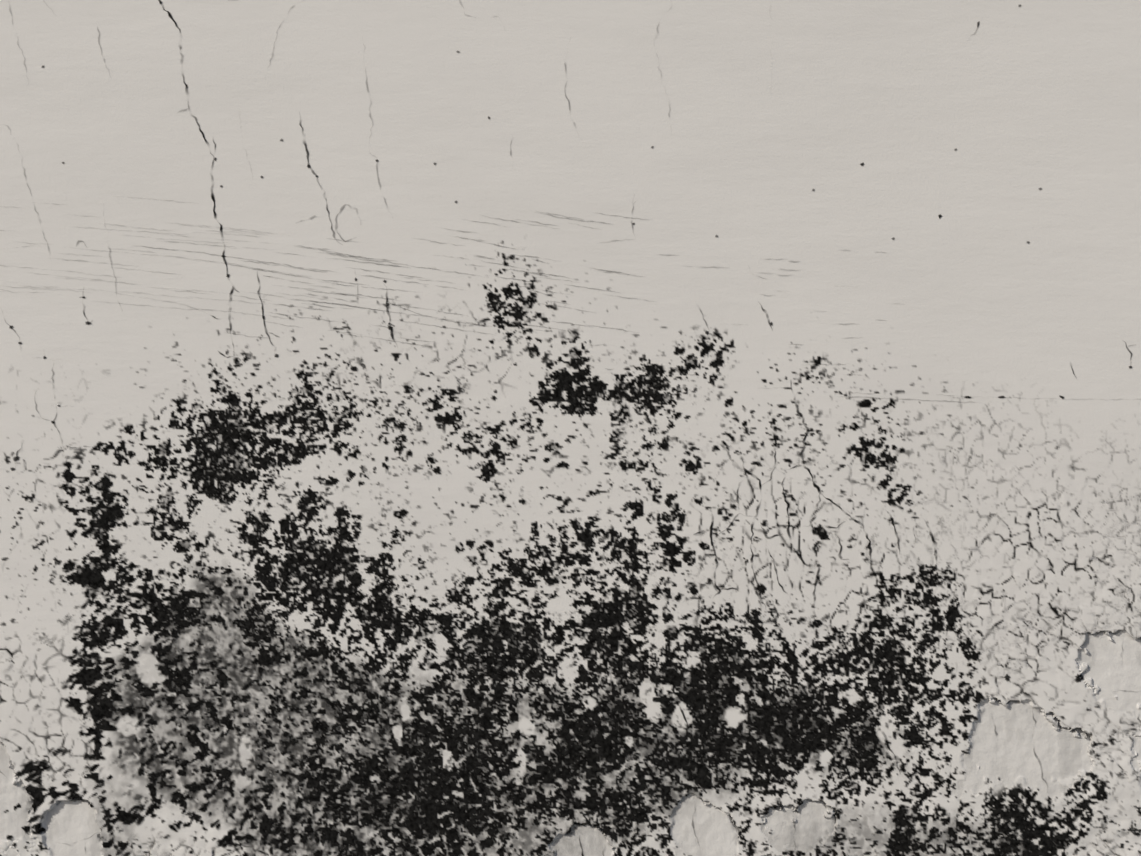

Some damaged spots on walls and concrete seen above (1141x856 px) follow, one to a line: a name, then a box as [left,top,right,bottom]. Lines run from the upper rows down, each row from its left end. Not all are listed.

crack [211,193,278,357]
mould [4,241,1141,856]
crack [695,404,900,626]
crack [931,503,1138,701]
spalling [0,742,104,856]
spalling [951,698,1095,812]
spalling [1075,630,1141,787]